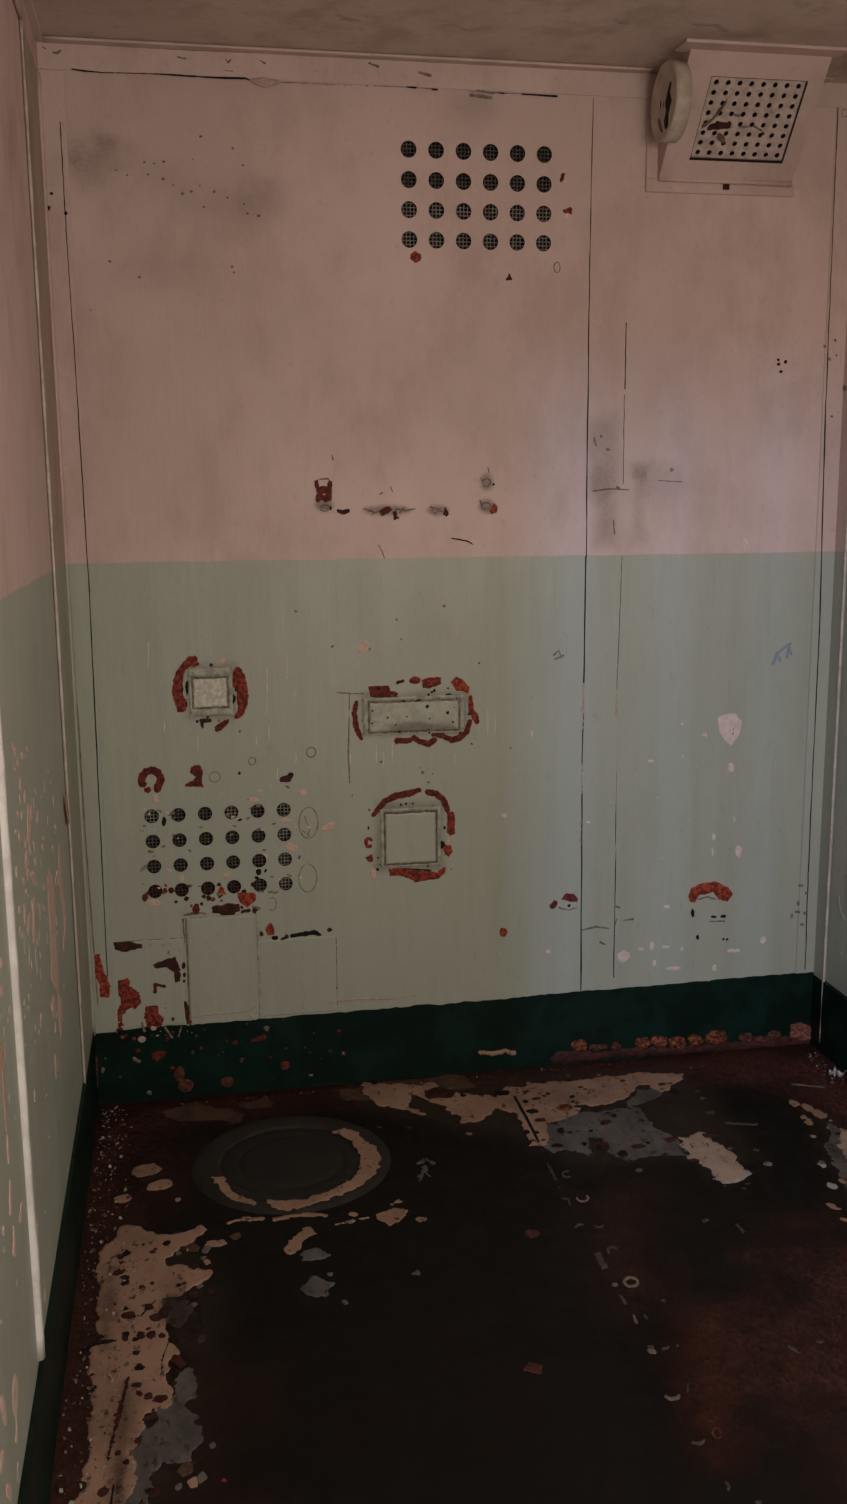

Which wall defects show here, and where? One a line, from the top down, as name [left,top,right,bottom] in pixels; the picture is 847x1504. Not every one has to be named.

peeling [0,743,70,1257]
peeling [74,1126,427,1504]
peeling [333,1022,811,1189]
peeling [789,1083,847,1222]